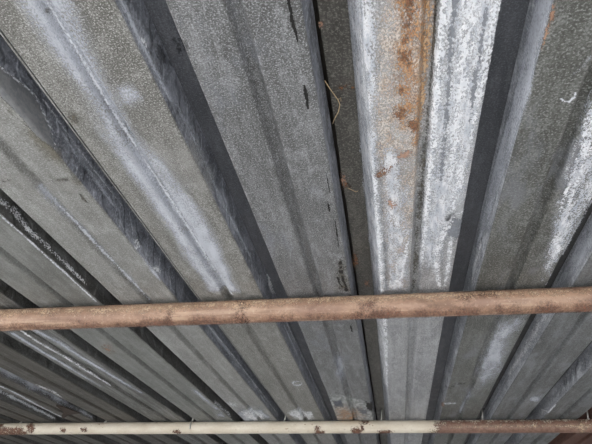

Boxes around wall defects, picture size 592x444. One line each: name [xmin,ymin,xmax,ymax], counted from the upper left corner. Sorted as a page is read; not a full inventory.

corrosion [372,0,434,288]
damp [348,0,501,292]
damp [543,91,592,288]
damp [486,313,549,416]